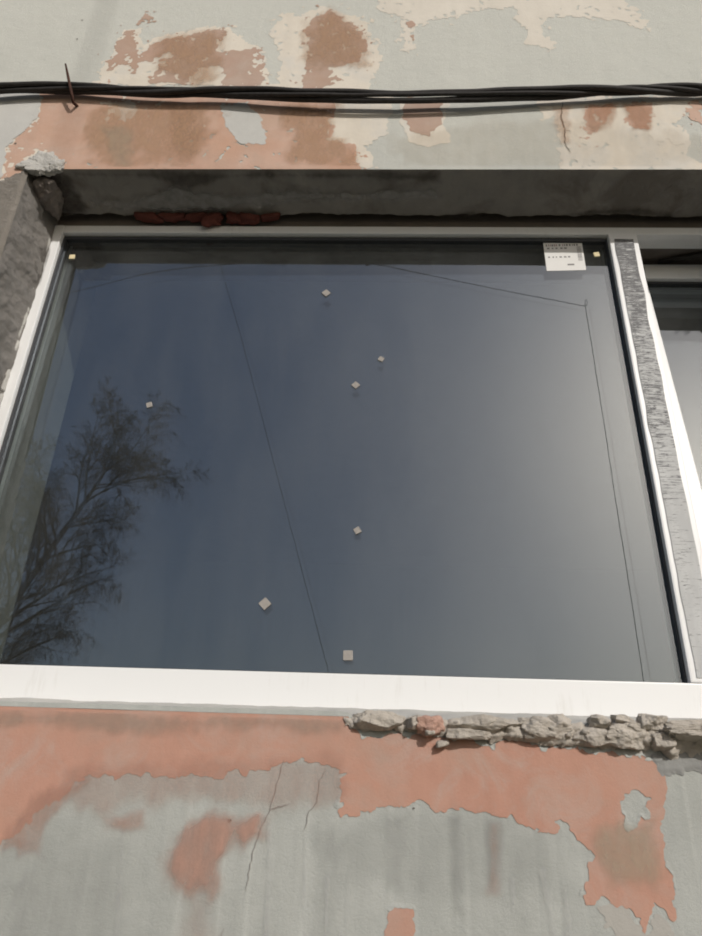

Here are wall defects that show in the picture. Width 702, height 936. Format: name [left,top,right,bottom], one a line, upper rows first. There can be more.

peeling [0,0,651,181]
peeling [536,95,702,169]
flaking render [133,211,281,228]
spalling [0,369,11,404]
peeling [0,701,702,936]